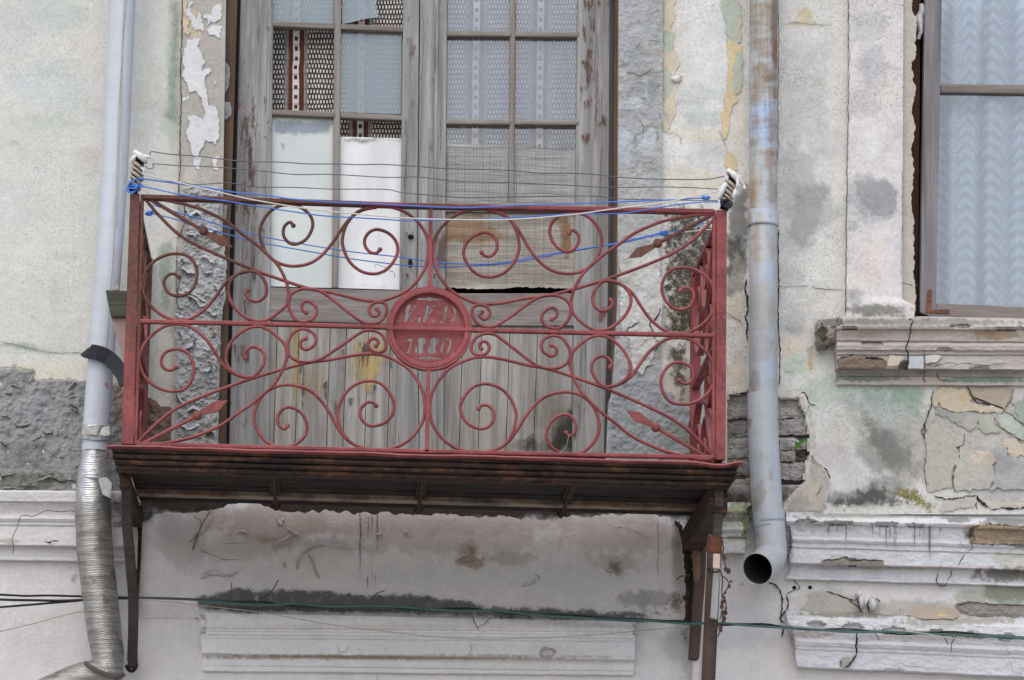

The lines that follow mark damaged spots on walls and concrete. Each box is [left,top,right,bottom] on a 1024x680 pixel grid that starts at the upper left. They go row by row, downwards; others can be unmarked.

peeling [182,0,232,170]
leakage [857,179,897,215]
spalling [0,364,86,491]
leakage [664,205,711,401]
spalling [722,385,750,485]
spalling [777,390,830,513]
peeling [887,355,941,370]
crack [905,321,1024,510]
peeling [923,386,1024,513]
leakage [255,576,646,621]
crack [768,582,800,637]
crack [827,591,880,667]